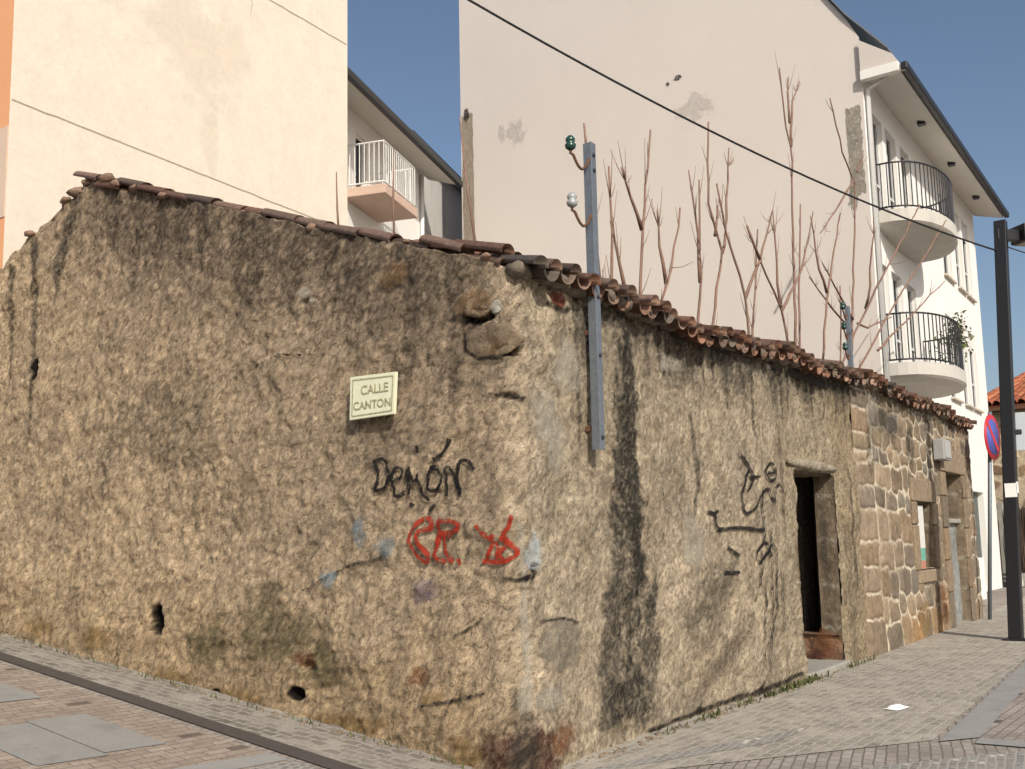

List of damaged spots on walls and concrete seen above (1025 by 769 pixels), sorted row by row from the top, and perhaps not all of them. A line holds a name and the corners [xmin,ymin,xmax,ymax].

spalling [845,105,866,210]
spalling [454,289,526,364]
damp [573,309,590,439]
damp [599,304,851,729]